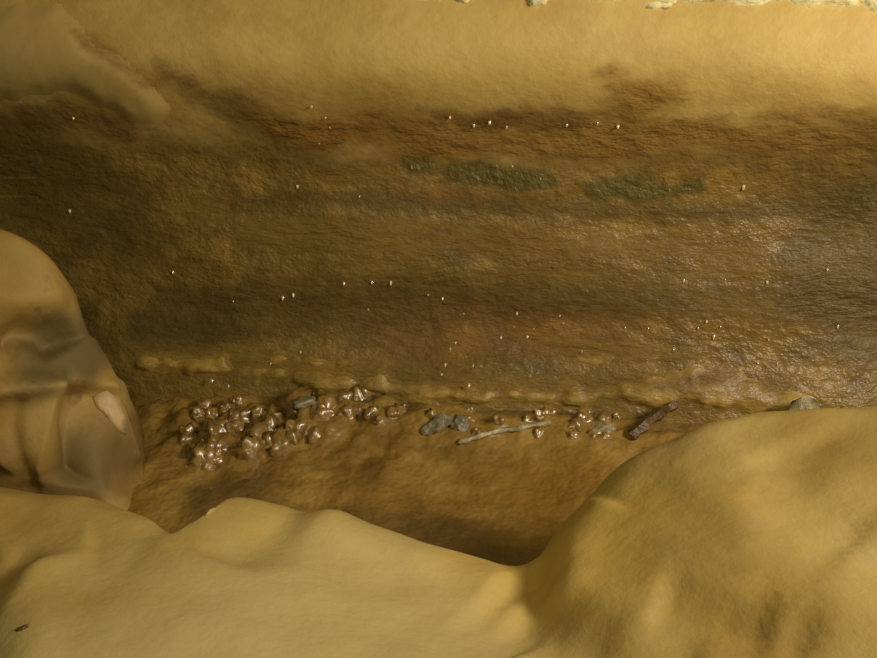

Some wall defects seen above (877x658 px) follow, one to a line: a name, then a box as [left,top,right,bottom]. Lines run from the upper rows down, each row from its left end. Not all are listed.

peeling [645,0,877,12]
damp [0,122,877,424]